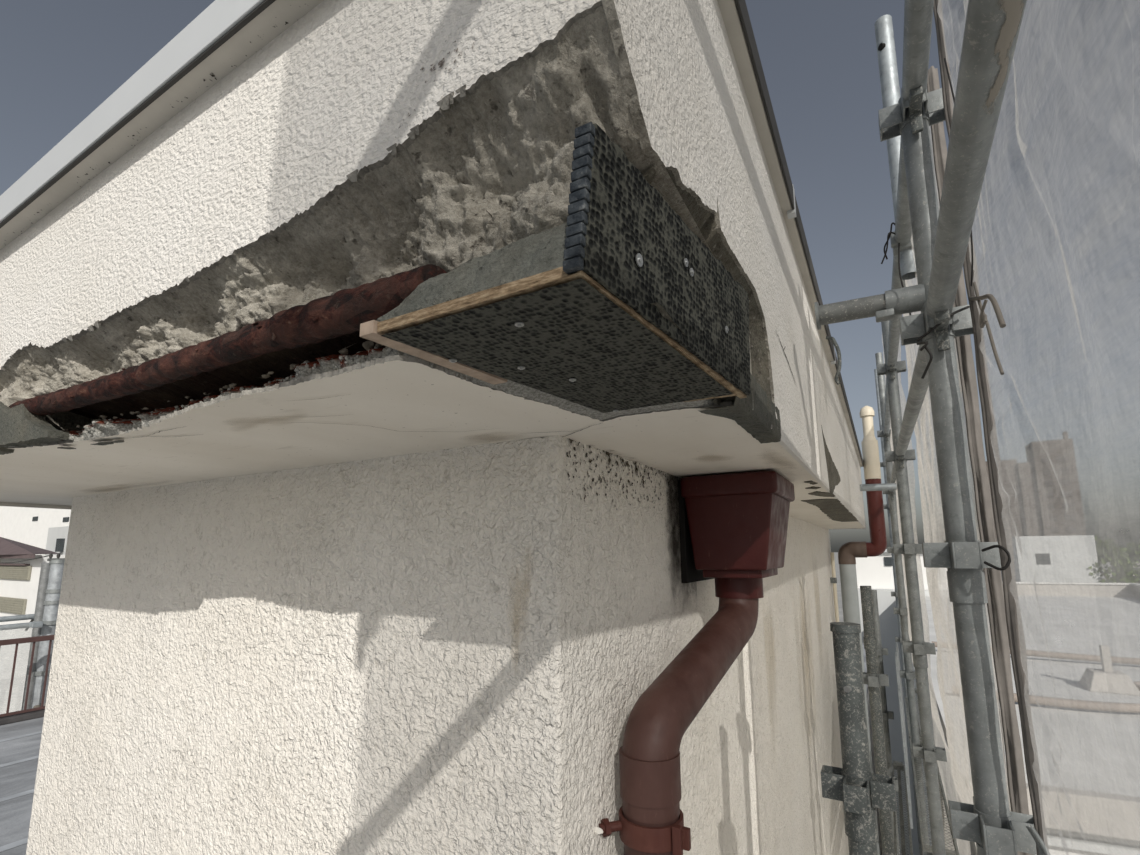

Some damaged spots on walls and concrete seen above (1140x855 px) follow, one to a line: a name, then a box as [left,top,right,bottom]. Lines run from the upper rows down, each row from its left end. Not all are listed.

spalling [0,6,772,407]
spalling [1,331,415,449]
rust [60,347,386,446]
spalling [430,362,736,420]
mould [566,438,678,510]